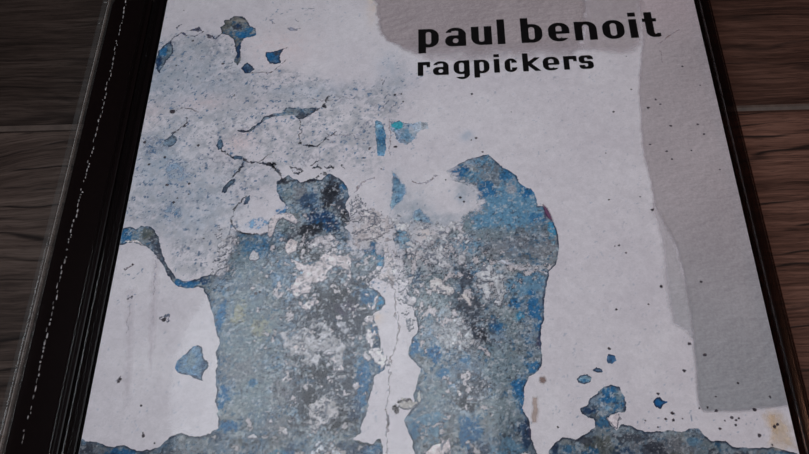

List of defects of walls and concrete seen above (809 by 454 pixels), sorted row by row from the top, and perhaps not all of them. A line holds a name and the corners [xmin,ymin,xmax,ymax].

peeling [220,16,256,73]
peeling [265,48,284,64]
crack [221,96,363,184]
peeling [79,154,559,454]
crack [358,275,411,452]
peeling [577,354,617,384]
peeling [549,385,797,454]